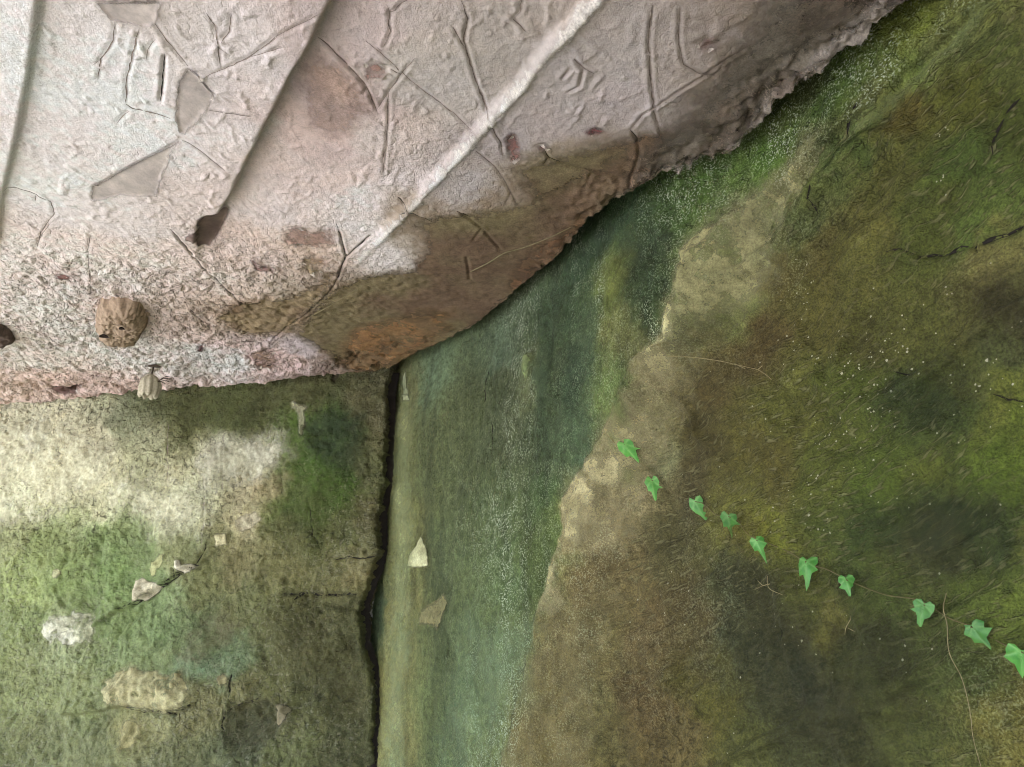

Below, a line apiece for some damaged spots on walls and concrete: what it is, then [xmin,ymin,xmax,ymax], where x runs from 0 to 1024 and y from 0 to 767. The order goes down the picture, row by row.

peeling [92,69,214,201]
crack [93,0,523,204]
spalling [186,207,228,246]
crack [270,224,370,343]
rust [508,221,582,290]
rust [344,311,451,371]
water stain [0,418,191,521]
water stain [204,441,278,486]
spalling [41,611,95,645]
crack [280,373,400,767]
water stain [386,395,410,767]
spalling [101,667,188,713]